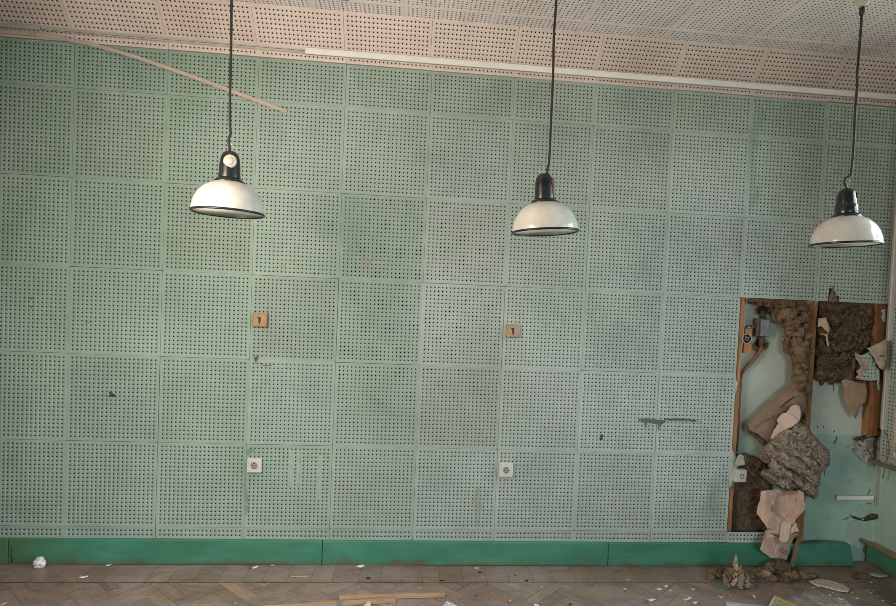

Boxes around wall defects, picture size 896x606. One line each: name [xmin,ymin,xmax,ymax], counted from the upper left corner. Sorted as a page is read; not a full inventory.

flaking render [849,428,881,467]